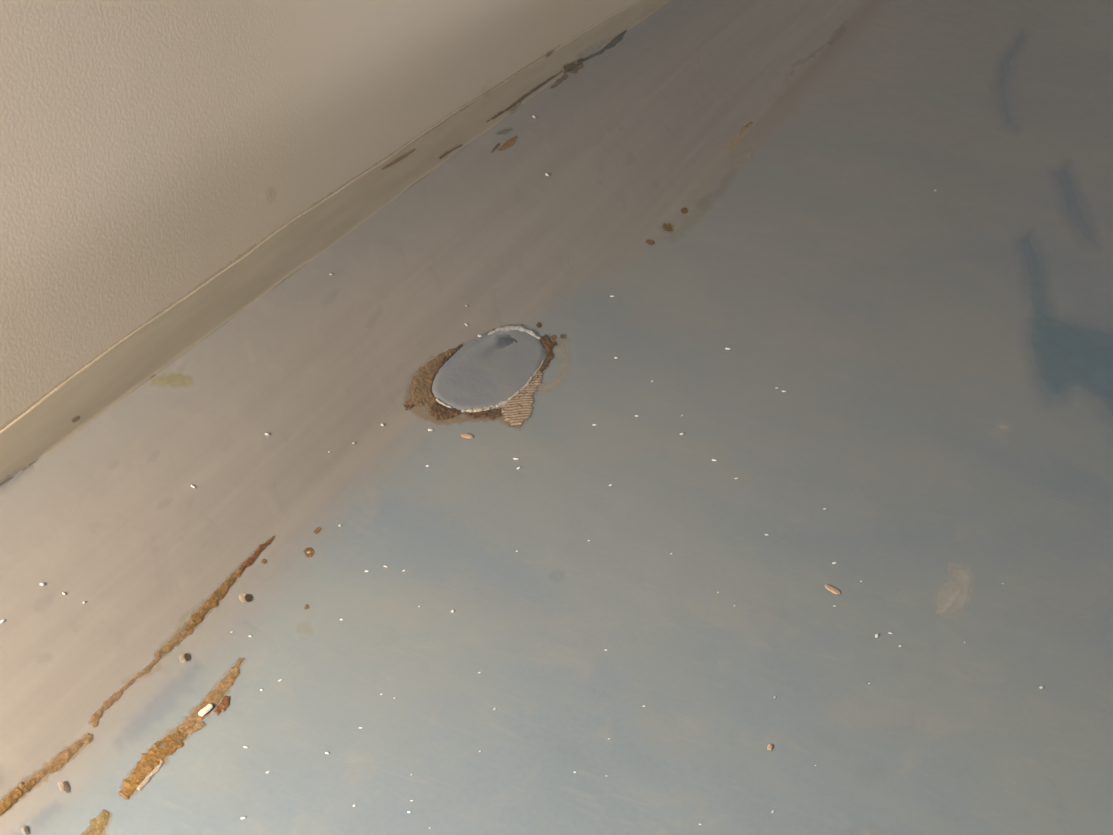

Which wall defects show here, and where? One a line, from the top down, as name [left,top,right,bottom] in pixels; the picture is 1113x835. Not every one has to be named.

peeling [404,322,567,429]
damp [1022,236,1113,415]
peeling [0,536,274,815]
peeling [81,810,109,835]